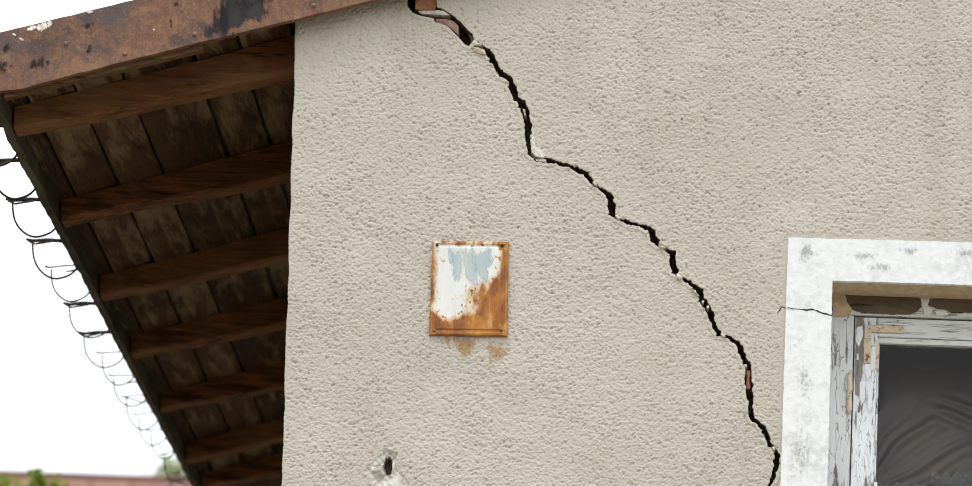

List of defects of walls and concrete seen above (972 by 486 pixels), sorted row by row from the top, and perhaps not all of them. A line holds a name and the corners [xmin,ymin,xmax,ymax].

crack [403,0,782,486]
crack [777,306,832,316]
peeling [832,294,972,412]
spalling [361,444,413,486]